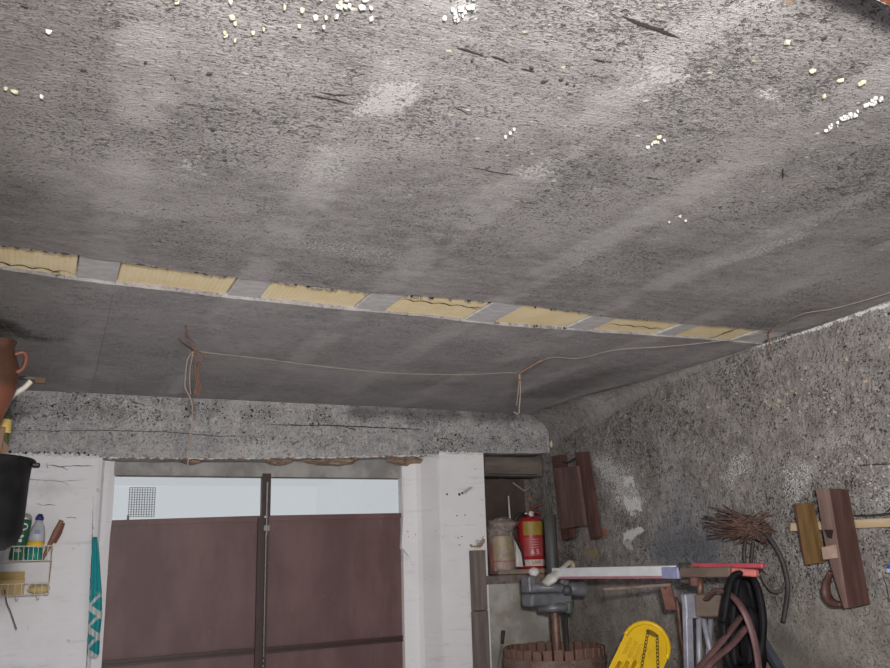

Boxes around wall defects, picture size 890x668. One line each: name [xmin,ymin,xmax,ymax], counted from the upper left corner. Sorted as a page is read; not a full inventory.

crack [16,413,451,440]